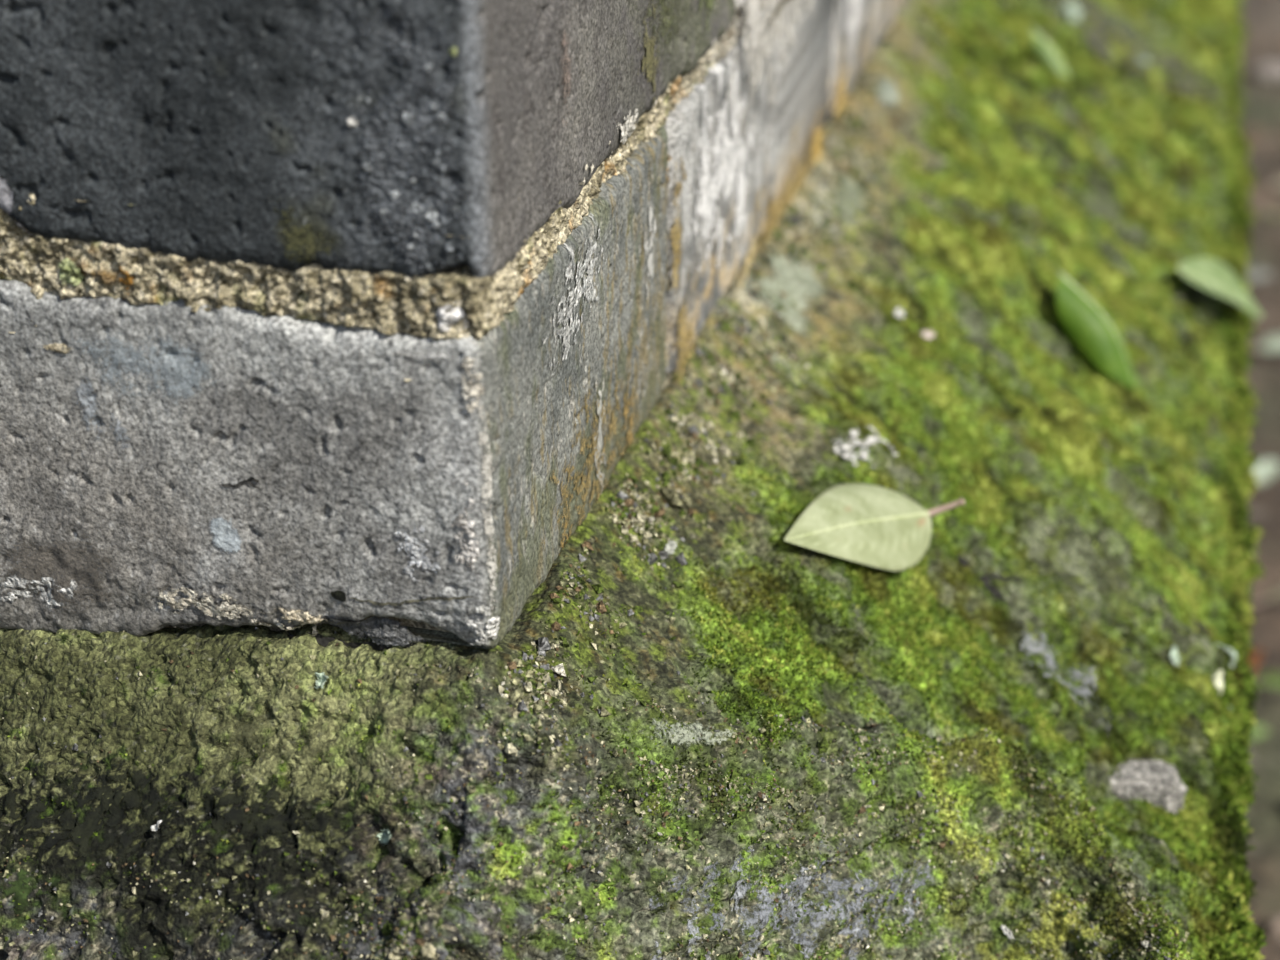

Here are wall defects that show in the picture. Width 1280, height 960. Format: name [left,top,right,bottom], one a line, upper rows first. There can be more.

damp [535,214,611,373]
damp [644,197,656,300]
damp [594,380,607,501]